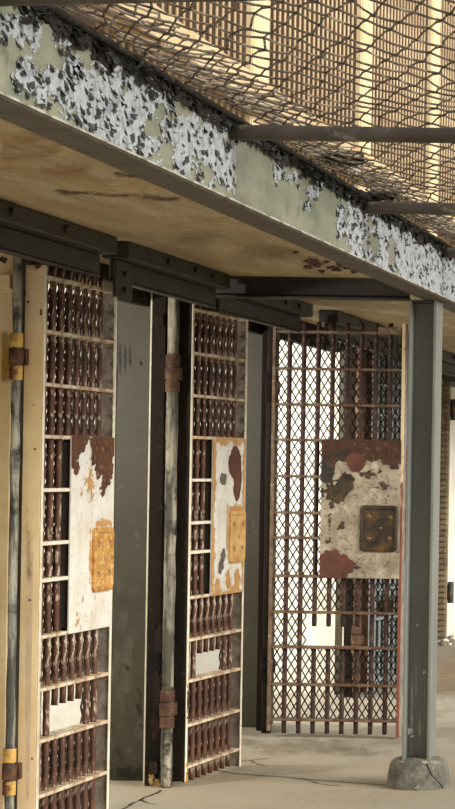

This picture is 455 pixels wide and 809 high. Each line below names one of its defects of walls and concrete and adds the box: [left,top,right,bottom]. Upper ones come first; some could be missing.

peeling [0,6,455,301]
rust [72,436,115,501]
rust [211,437,246,596]
rust [321,439,401,504]